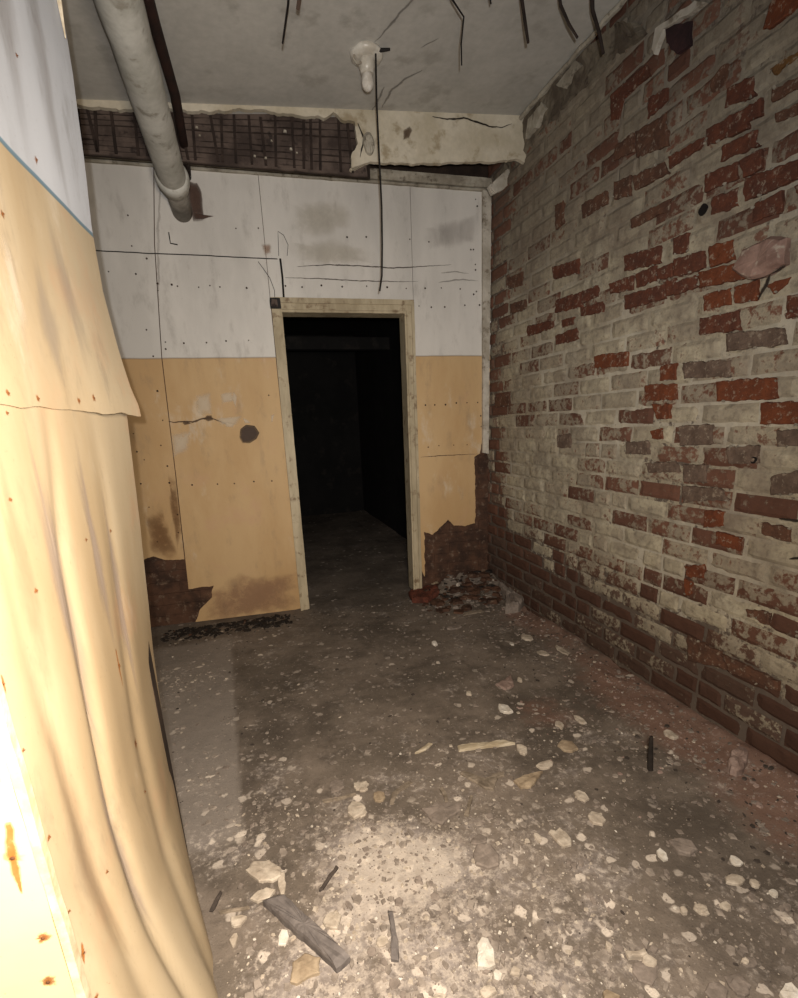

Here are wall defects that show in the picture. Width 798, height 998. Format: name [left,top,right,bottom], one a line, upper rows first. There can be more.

flaking render [282,0,301,44]
flaking render [520,0,530,44]
flaking render [590,0,605,55]
spalling [652,1,708,55]
flaking render [77,108,152,162]
flaking render [170,112,370,179]
crack [432,116,510,128]
peeling [580,52,798,224]
peeling [527,232,798,551]
peeling [168,397,259,451]
peeling [746,609,772,625]
rust [6,824,22,892]